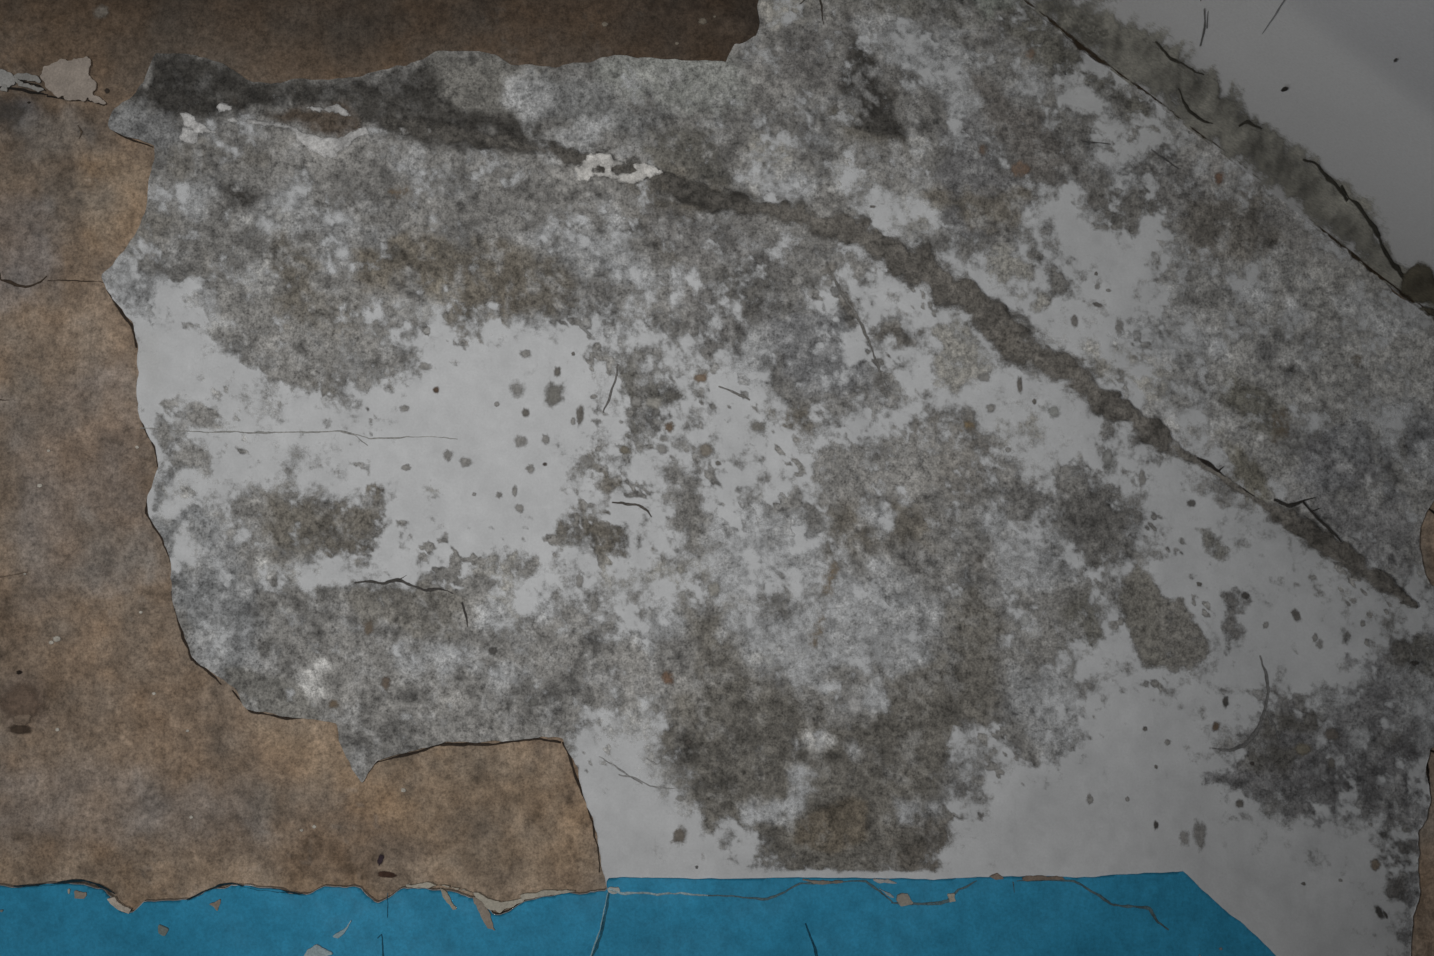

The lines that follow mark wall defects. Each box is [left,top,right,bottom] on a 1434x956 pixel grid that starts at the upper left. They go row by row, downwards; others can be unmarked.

crack [1024,0,1262,177]
damp [891,0,1434,592]
crack [1303,159,1431,315]
spalling [1390,262,1434,319]
spalling [0,0,1169,930]
damp [102,0,1146,872]
crack [612,502,652,517]
crack [1197,457,1343,543]
peeling [1113,538,1252,708]
damp [1205,556,1434,953]
peeling [304,920,351,956]
spalling [1411,748,1434,956]